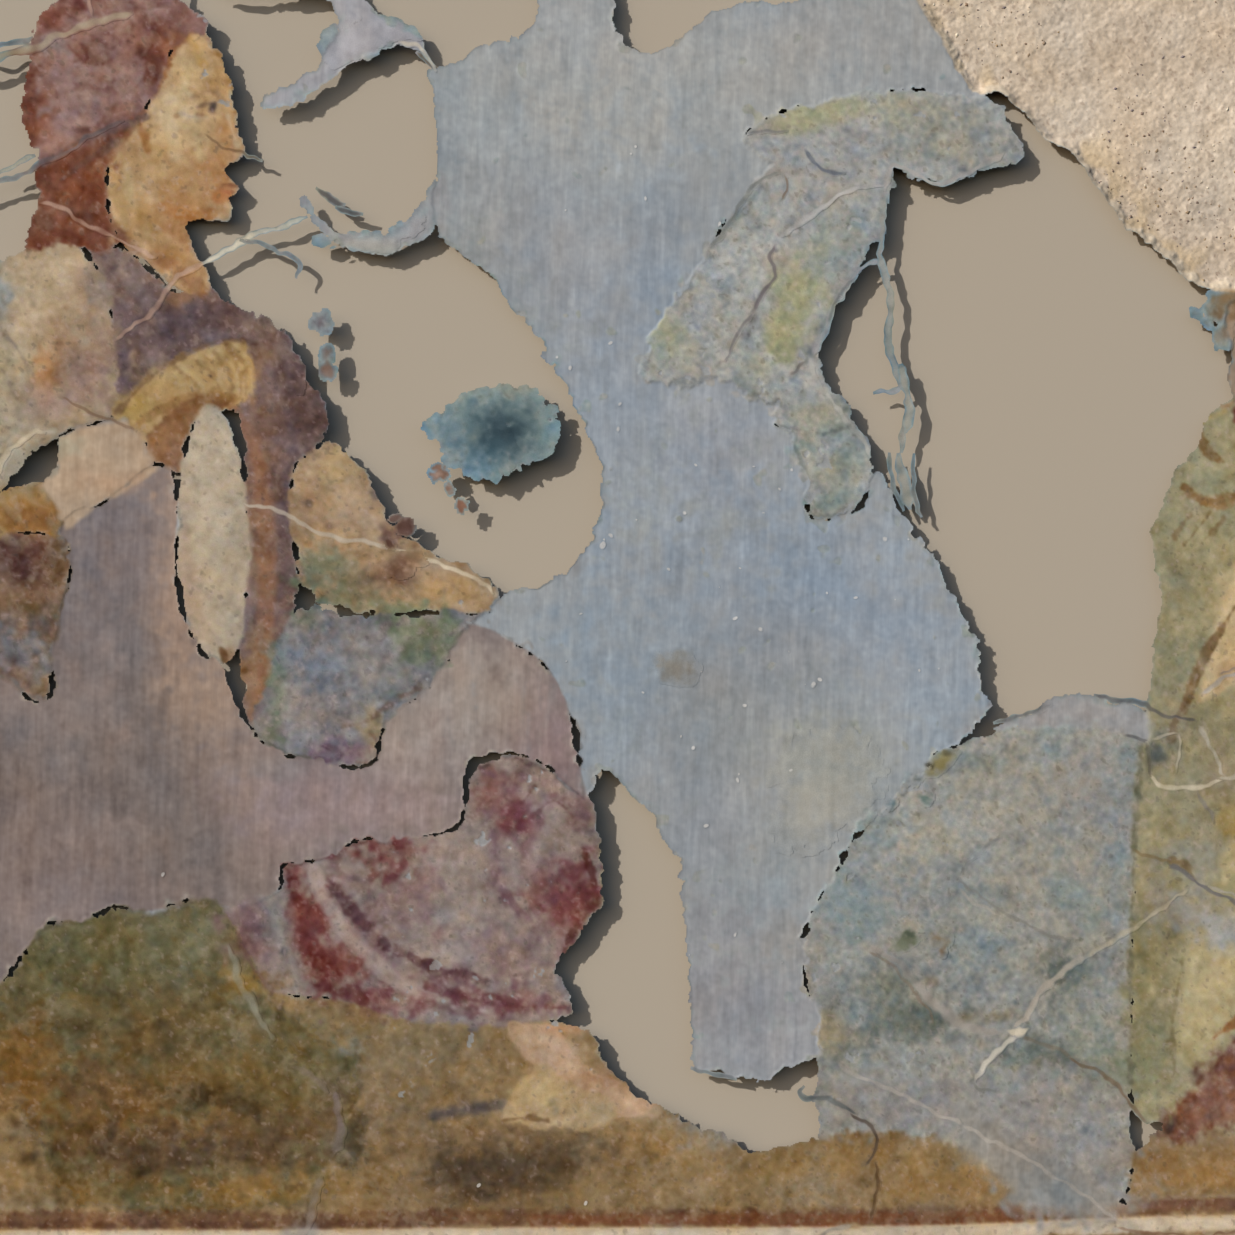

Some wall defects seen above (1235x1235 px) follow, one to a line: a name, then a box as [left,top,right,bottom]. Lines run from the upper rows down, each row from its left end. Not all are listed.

crack [0,0,133,62]
crack [398,40,437,73]
crack [0,119,363,342]
crack [0,427,46,474]
water stain [421,395,541,484]
crack [243,502,494,596]
flaking render [368,0,1235,1082]
flaking render [0,420,589,983]
crack [993,703,1053,724]
crack [1094,666,1235,824]
crack [868,837,1235,1124]
crack [797,1061,1235,1235]